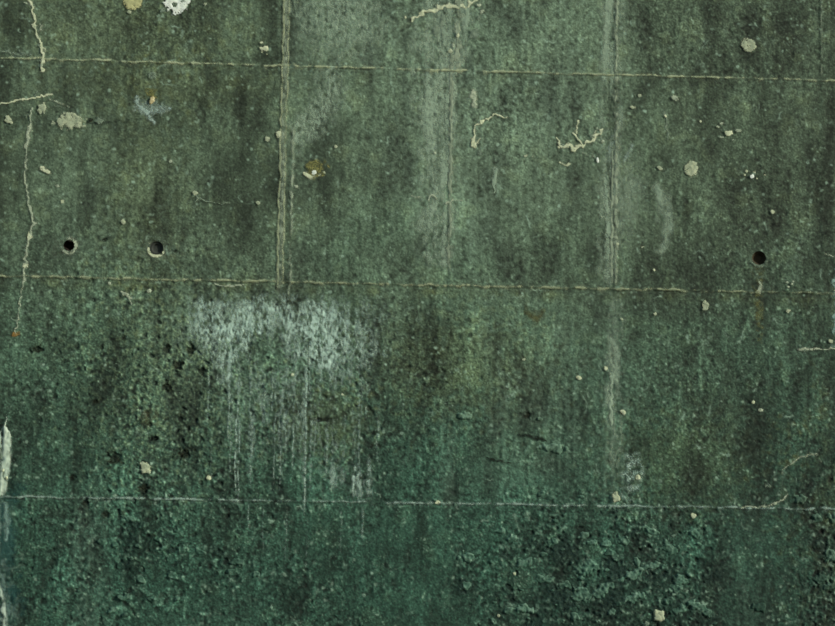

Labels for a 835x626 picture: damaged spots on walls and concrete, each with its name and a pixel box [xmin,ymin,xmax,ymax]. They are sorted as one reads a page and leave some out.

crack [405,0,484,68]
crack [0,0,68,333]
crack [556,120,604,166]
leakage [190,297,365,506]
leakage [0,414,26,566]
leakage [0,576,24,626]